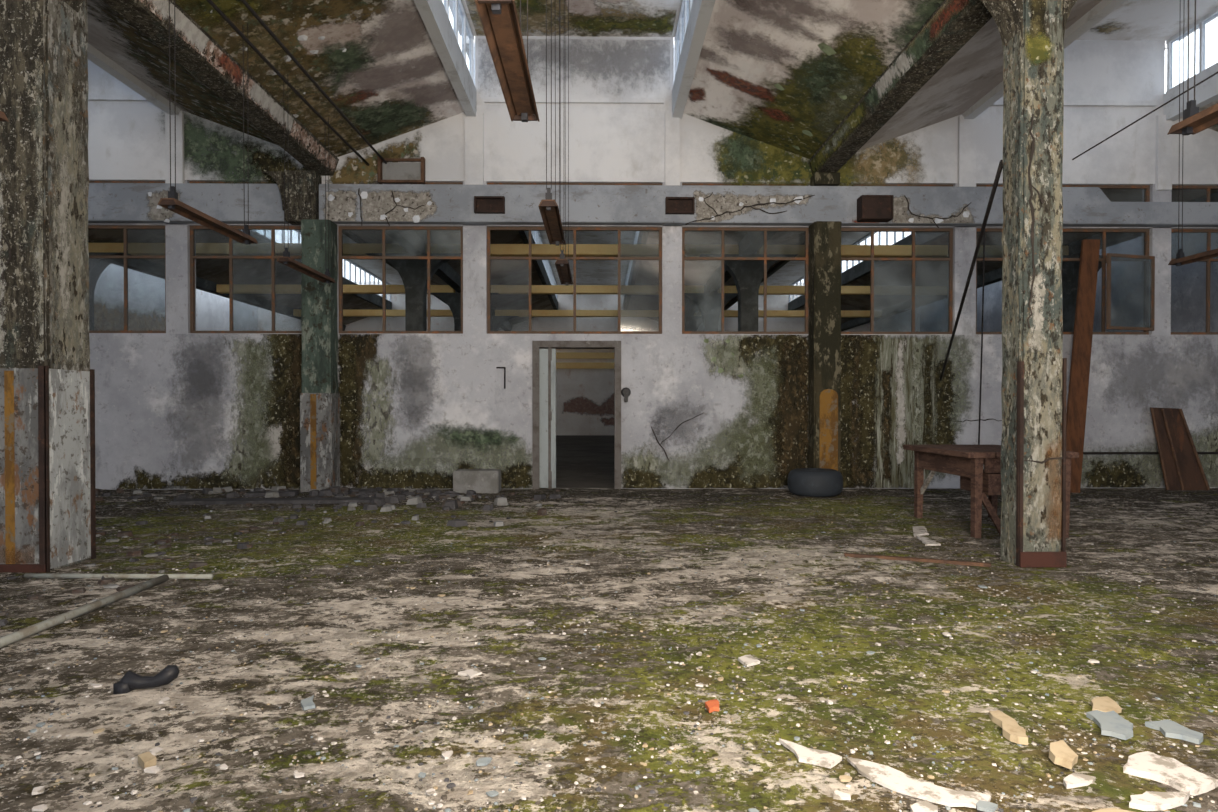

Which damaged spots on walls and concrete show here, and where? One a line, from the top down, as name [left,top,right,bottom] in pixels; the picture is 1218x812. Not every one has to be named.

damp [87,0,308,184]
damp [173,0,458,184]
peeling [323,189,437,223]
peeling [693,190,811,222]
damp [700,0,893,186]
damp [837,138,922,186]